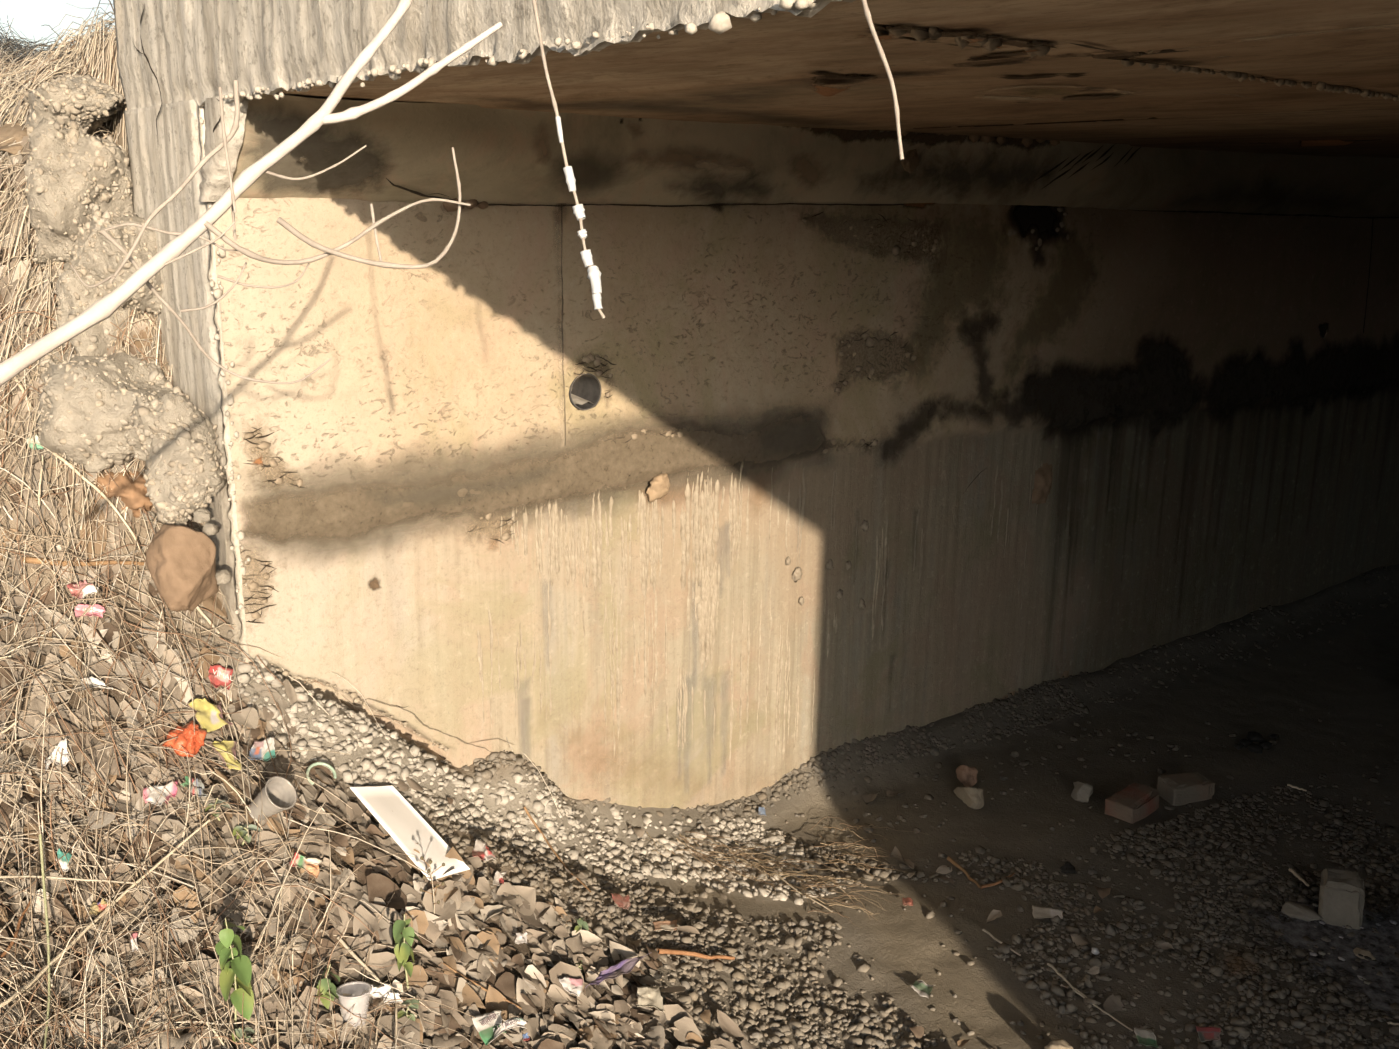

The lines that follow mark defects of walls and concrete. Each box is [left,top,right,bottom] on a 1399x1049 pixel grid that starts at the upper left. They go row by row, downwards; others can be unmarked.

crack [1064,42,1188,55]
leakage [247,111,387,195]
leakage [560,159,615,188]
leakage [882,315,1399,460]
leakage [481,464,837,770]